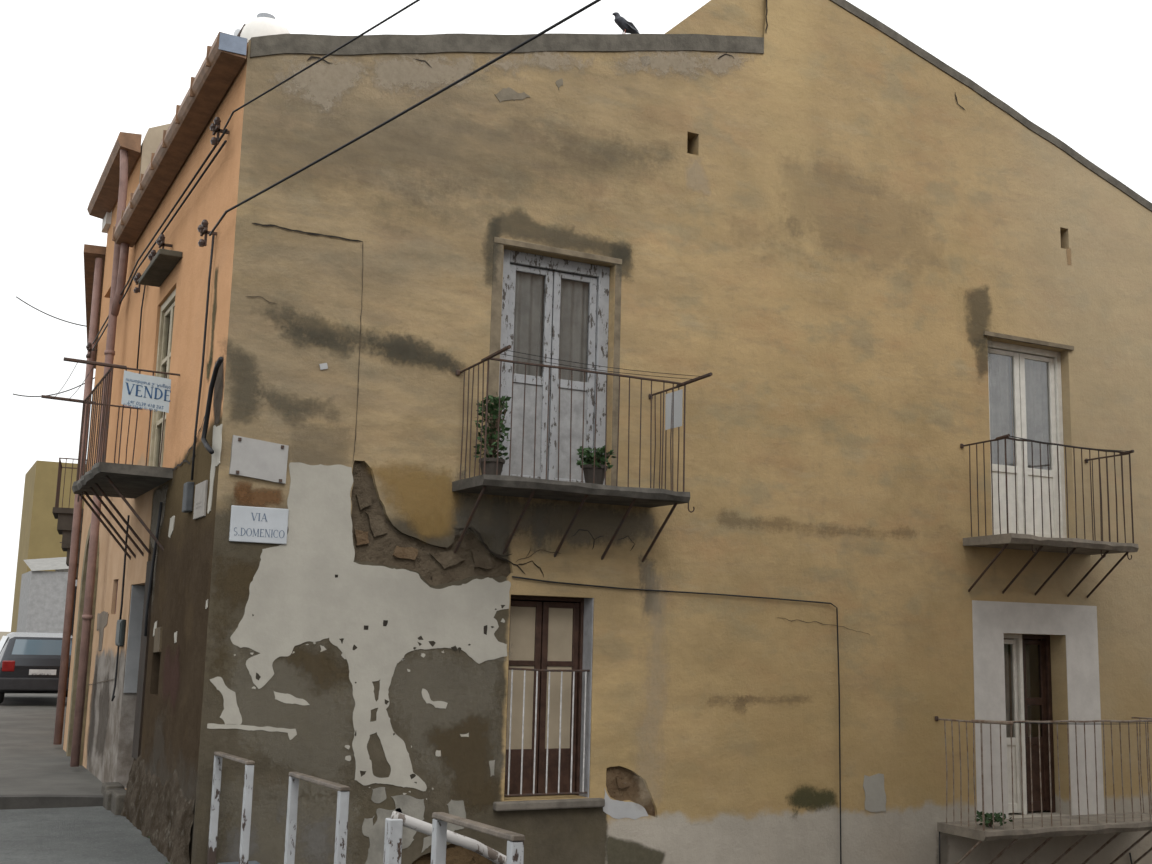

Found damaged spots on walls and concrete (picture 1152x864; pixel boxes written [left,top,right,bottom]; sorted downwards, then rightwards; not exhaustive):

leakage [207,270,223,425]
flaking render [230,461,511,864]
leakage [87,671,109,756]
flaking render [207,677,297,740]
flaking render [603,766,655,820]
leakage [790,787,835,809]